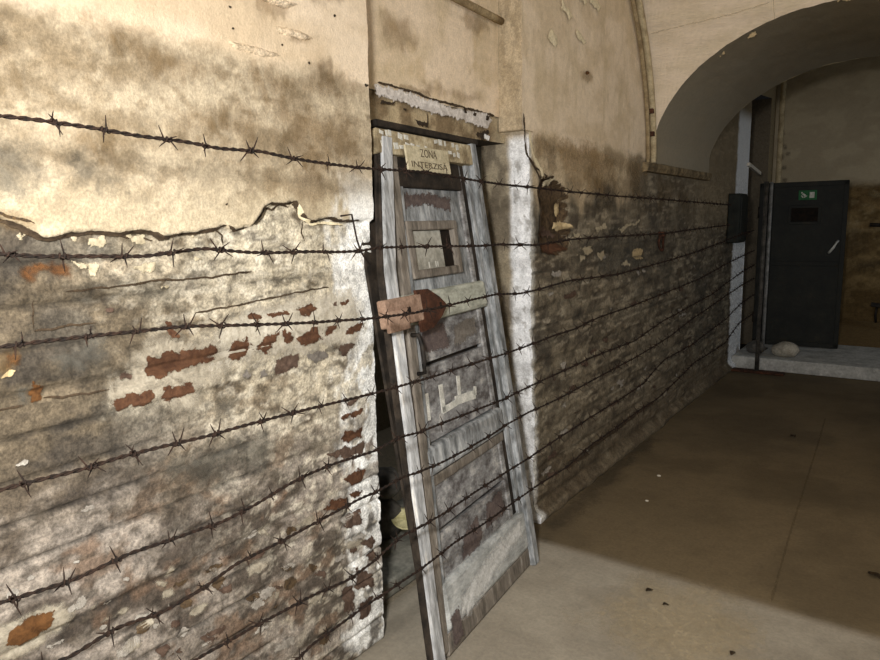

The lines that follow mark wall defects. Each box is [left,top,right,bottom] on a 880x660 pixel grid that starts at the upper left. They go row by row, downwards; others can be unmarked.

peeling [88,235,108,248]
peeling [126,234,146,244]
flaking render [537,176,606,261]
peeling [72,261,99,276]
flaking render [108,289,366,414]
flaking render [327,398,366,459]
peeling [157,567,207,616]
peeling [205,549,232,594]
peeling [248,551,267,577]
peeling [246,557,326,610]
peeling [323,468,376,620]
peeling [116,608,189,660]